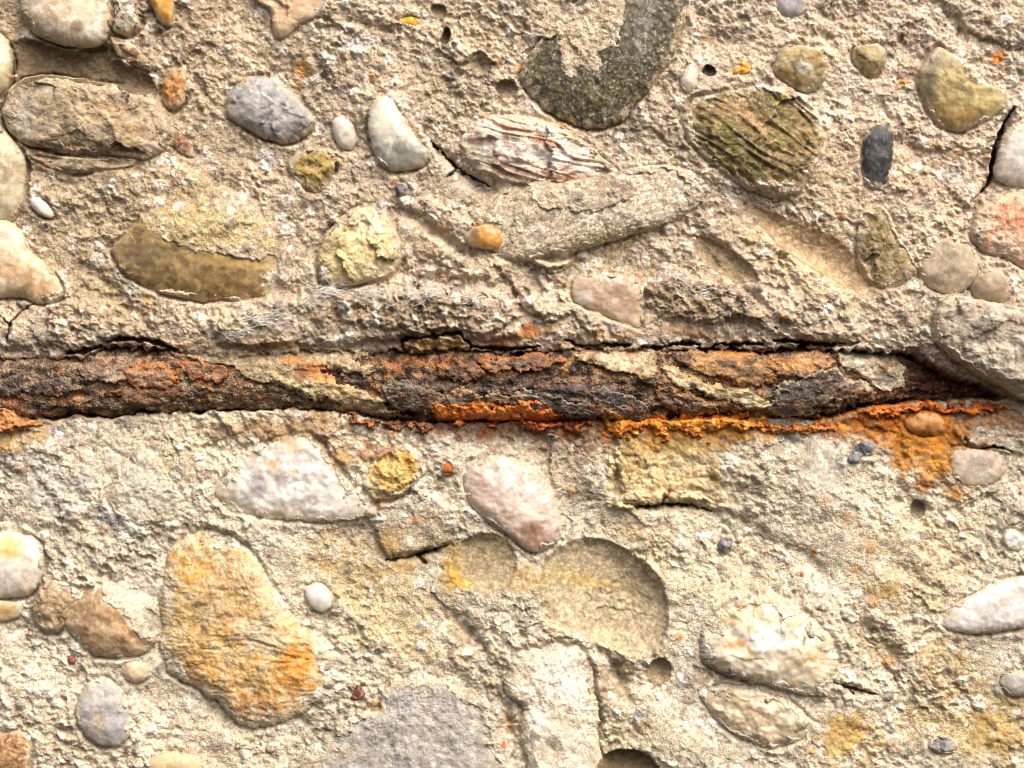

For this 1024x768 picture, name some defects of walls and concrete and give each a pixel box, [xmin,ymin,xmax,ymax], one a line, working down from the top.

crack [980,107,1014,193]
crack [67,336,183,355]
crack [401,331,538,352]
rust [491,323,541,345]
crack [566,338,844,350]
spalling [0,317,1008,509]
rust [558,417,774,499]
rust [816,400,1021,491]